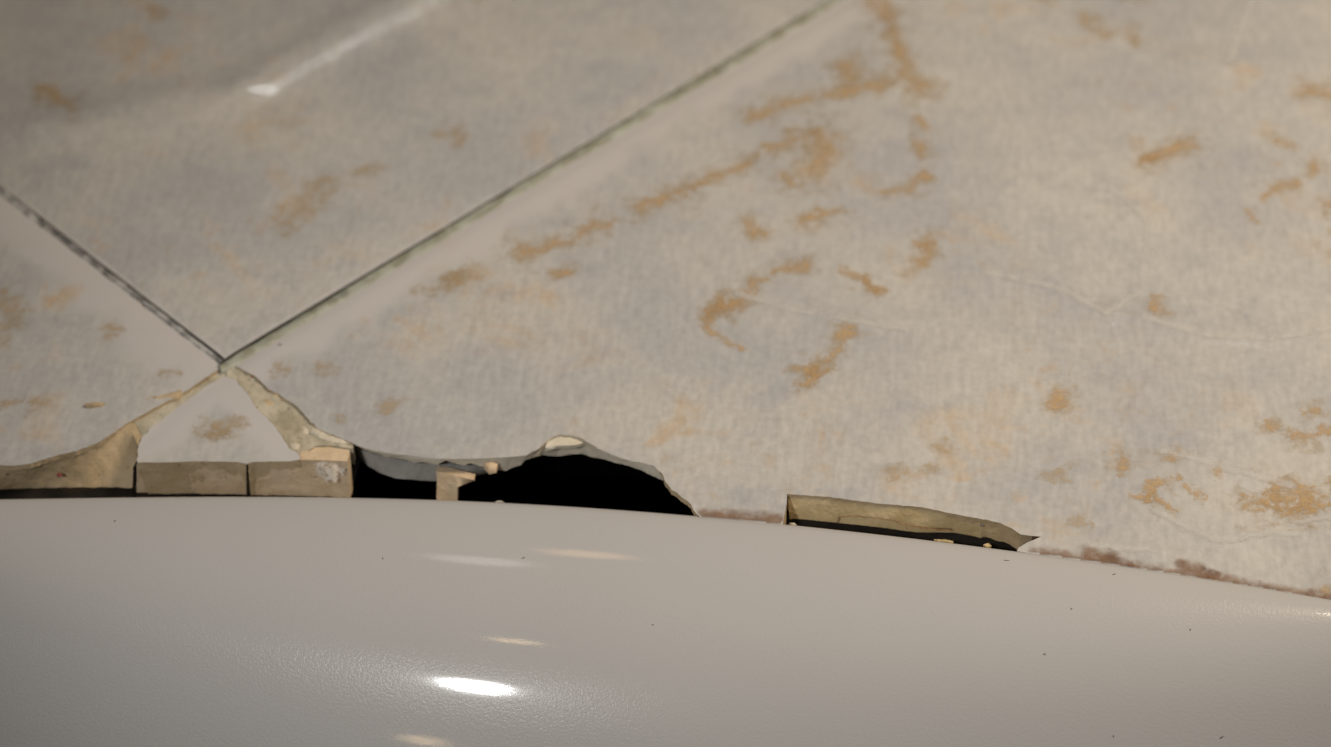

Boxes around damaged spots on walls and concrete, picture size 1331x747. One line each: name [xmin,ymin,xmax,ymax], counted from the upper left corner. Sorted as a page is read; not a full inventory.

spalling [0,423,147,492]
spalling [189,426,663,497]
peeling [788,497,1018,551]
rust [1040,551,1331,599]